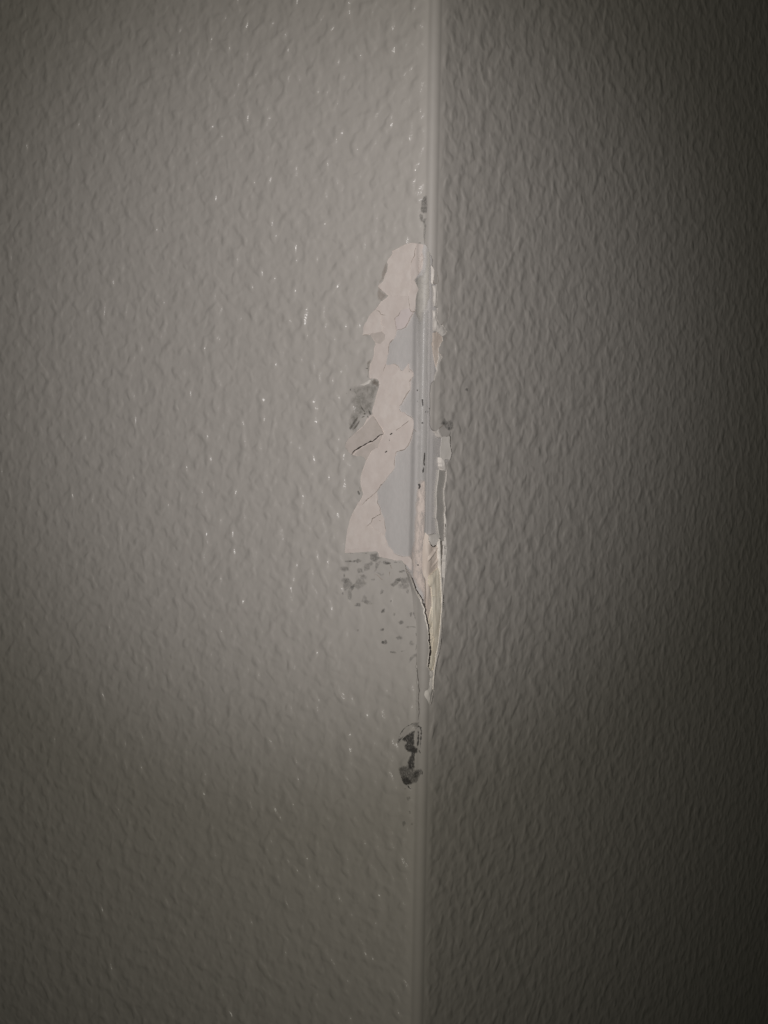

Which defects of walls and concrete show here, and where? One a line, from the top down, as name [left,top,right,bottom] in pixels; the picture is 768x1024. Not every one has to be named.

peeling [345,243,452,706]
crack [404,563,431,718]